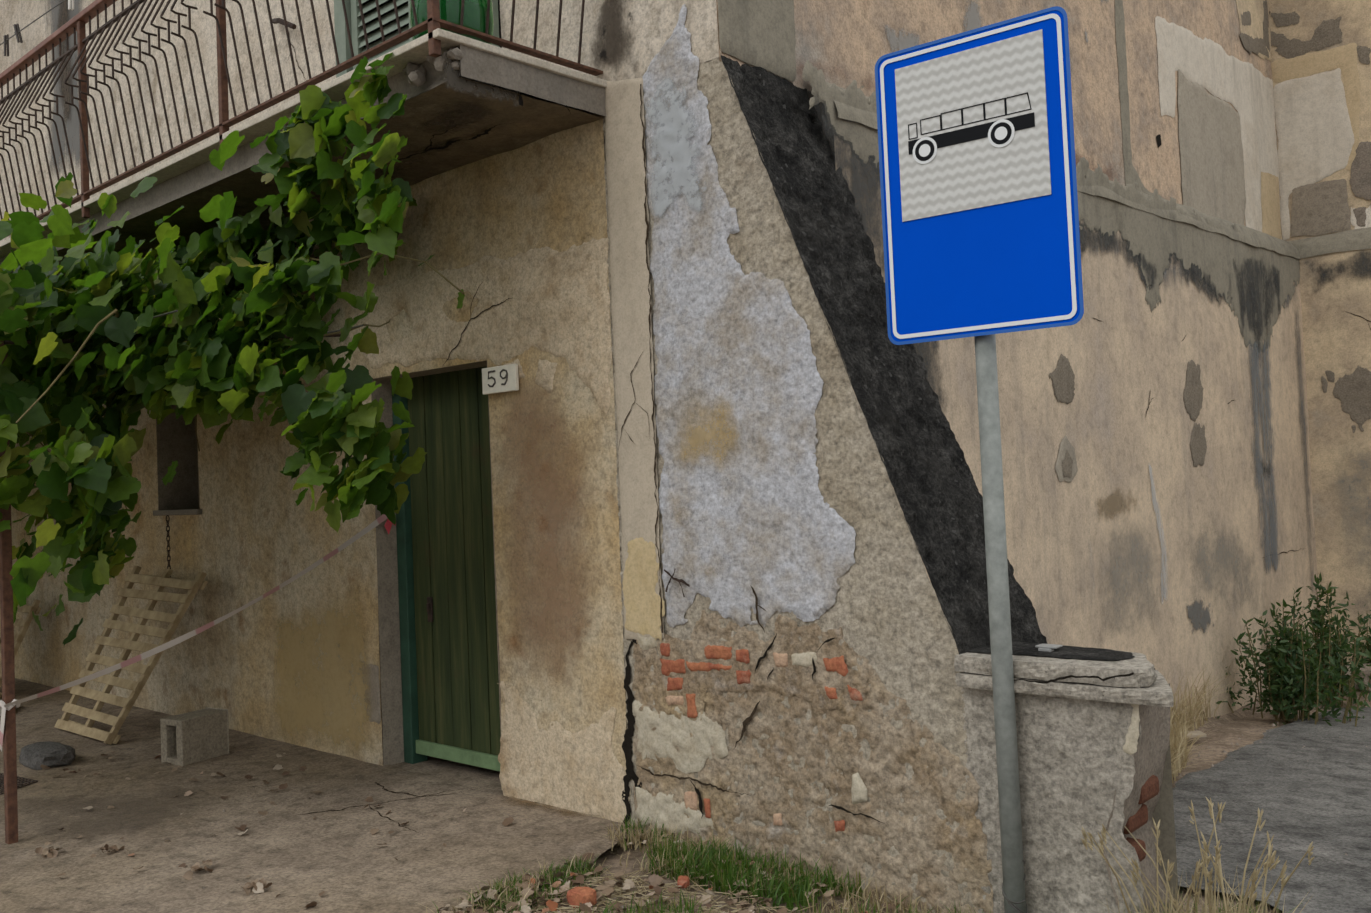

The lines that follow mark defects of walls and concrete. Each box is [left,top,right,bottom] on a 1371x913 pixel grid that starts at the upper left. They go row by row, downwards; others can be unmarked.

peeling [1236,0,1371,65]
peeling [1349,141,1371,229]
damp [1312,251,1371,285]
crack [617,84,748,823]
peeling [632,4,994,913]
spalling [1049,354,1075,404]
damp [1079,222,1310,595]
spalling [1184,360,1207,467]
spalling [1321,365,1371,437]
crack [735,585,777,747]
crack [812,638,834,680]
crack [829,805,883,823]